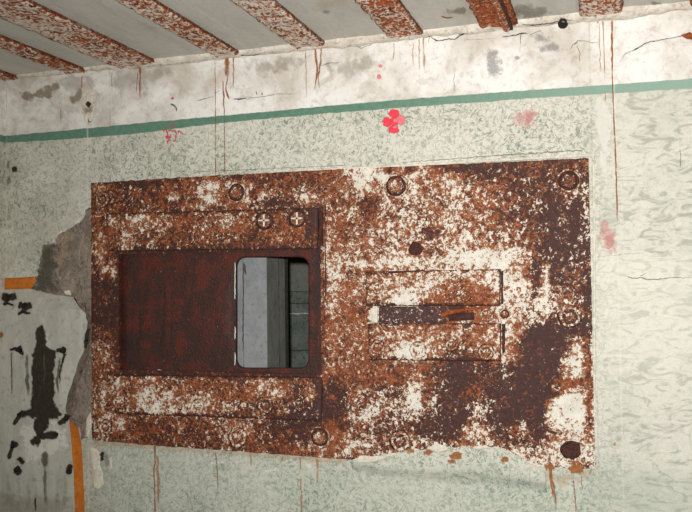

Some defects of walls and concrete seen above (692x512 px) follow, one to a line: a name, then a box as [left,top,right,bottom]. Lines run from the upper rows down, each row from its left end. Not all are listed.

crack [503,20,570,43]
corrosion [215,58,234,172]
corrosion [597,21,618,218]
spalling [32,208,92,315]
crack [628,272,681,280]
spalling [71,325,92,440]
water stain [20,421,70,493]
peeling [90,448,112,489]
corrosion [545,456,556,503]
corrosion [568,463,583,499]